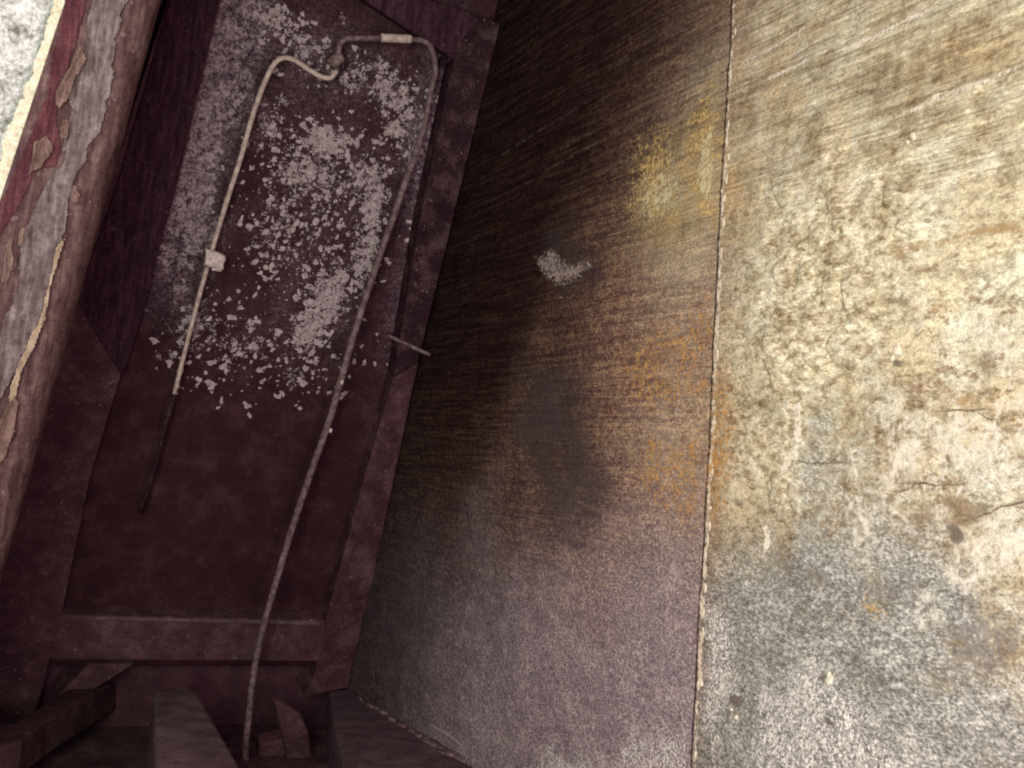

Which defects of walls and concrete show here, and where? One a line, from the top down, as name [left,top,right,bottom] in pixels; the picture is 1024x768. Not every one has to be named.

peeling [0,0,129,464]
corrosion [628,68,723,234]
corrosion [614,297,733,525]
crack [898,482,967,491]
crack [953,501,1024,522]